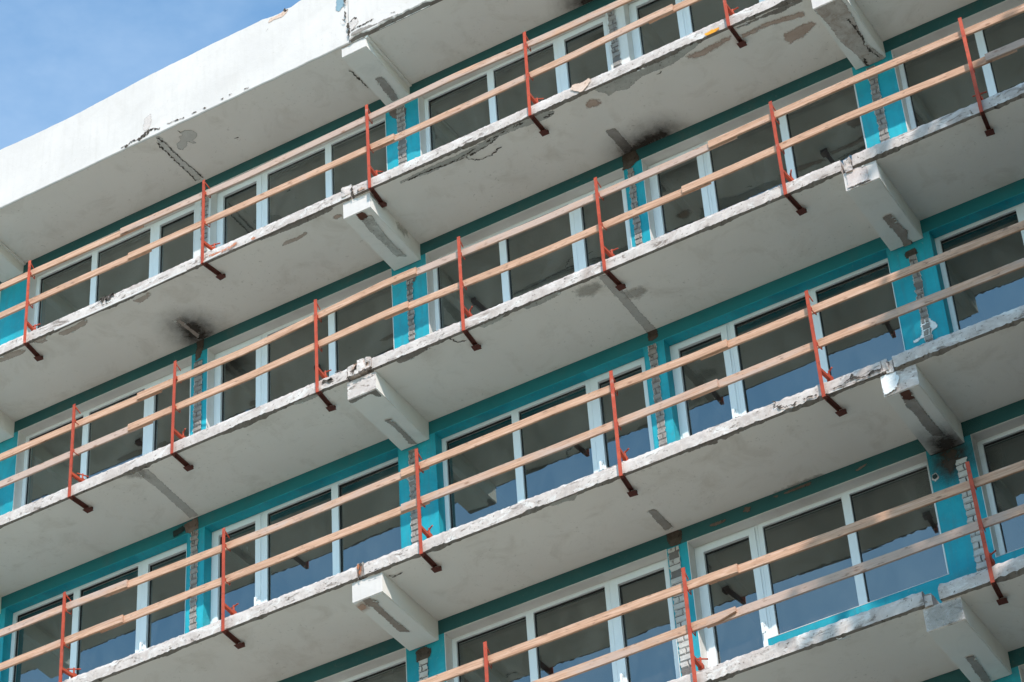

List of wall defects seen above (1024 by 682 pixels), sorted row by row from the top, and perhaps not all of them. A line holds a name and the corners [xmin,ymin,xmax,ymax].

crack [121,128,203,181]
crack [404,113,554,182]
flaking render [883,214,937,343]